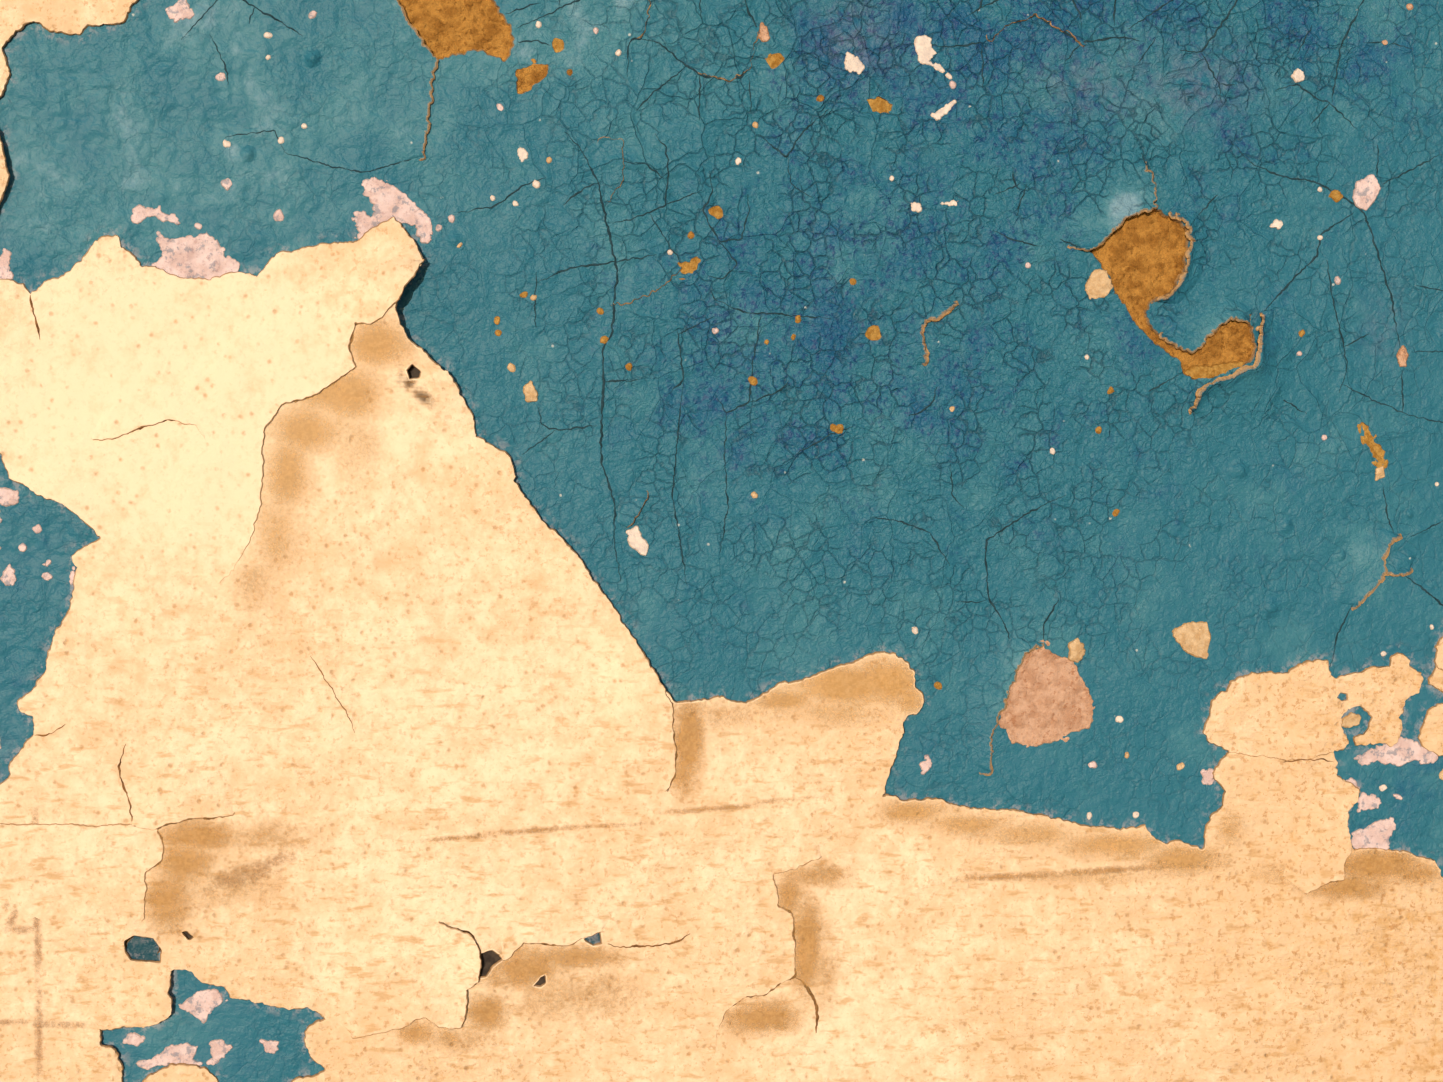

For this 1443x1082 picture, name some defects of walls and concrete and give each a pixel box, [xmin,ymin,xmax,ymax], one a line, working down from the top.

crack [181,0,302,83]
crack [29,295,40,339]
crack [460,0,831,584]
crack [1230,141,1443,423]
peeling [0,0,1443,849]
peeling [0,765,235,959]
crack [117,744,133,819]
peeling [101,914,482,1082]
peeling [497,893,616,961]
crack [609,934,689,948]
crack [793,976,819,1032]
peeling [1281,706,1443,894]